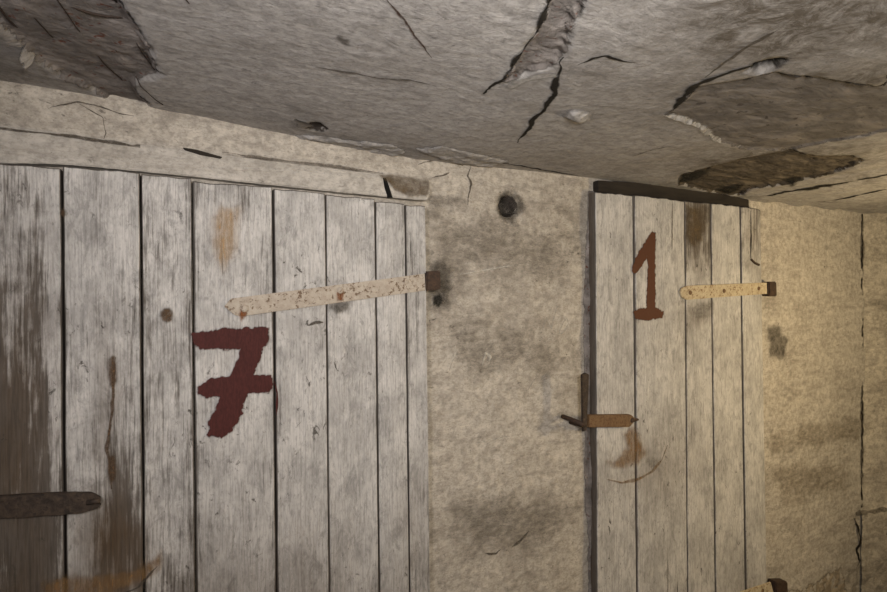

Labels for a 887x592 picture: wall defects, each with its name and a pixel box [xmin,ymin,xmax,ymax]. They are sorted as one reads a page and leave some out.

flaking render [0,0,163,106]
crack [317,67,436,87]
crack [483,0,551,94]
flaking render [504,0,584,89]
crack [517,55,635,143]
crack [673,28,785,111]
flaking render [662,72,887,196]
leakage [769,328,787,356]
crack [855,382,887,565]